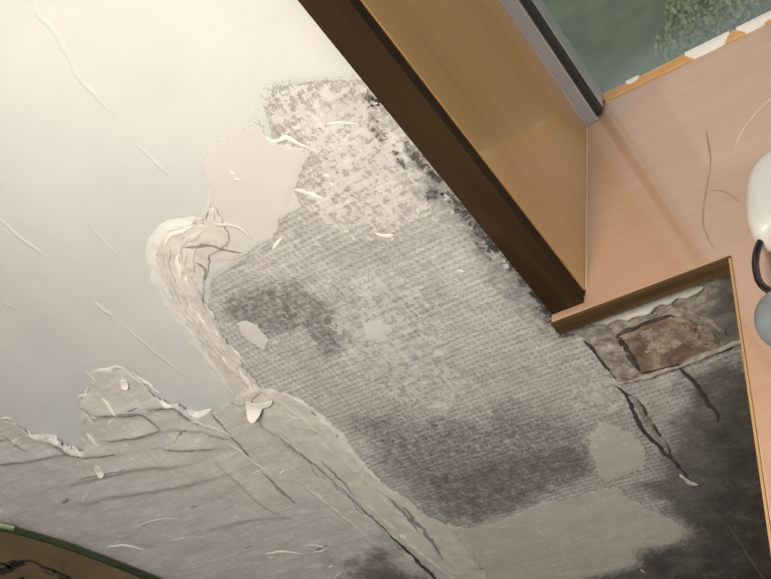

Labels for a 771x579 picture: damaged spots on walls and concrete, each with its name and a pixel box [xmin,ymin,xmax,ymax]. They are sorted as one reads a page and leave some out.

damp [265,135,315,151]
damp [294,189,324,199]
damp [394,141,574,337]
flaking render [0,365,484,579]
crack [276,434,458,579]
damp [357,553,424,579]
flaking render [145,80,746,579]
crack [583,340,698,486]
damp [603,361,771,579]
crack [679,368,719,422]